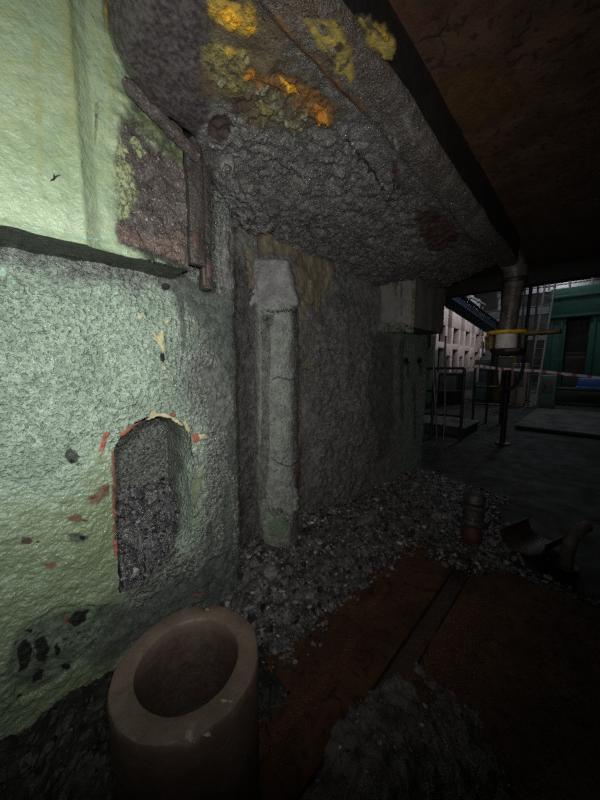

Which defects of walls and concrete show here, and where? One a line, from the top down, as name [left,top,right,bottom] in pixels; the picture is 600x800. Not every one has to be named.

peeling [303,20,354,84]
spalling [208,97,271,150]
spalling [115,119,188,267]
peeling [153,320,169,370]
peeling [147,411,208,443]
spalling [11,608,106,689]